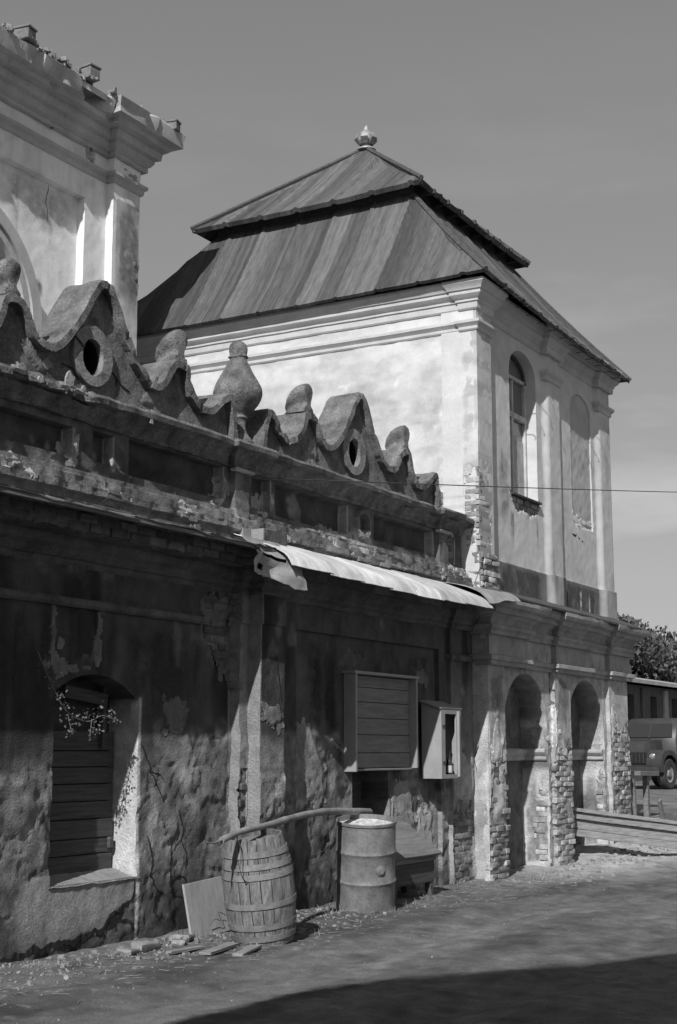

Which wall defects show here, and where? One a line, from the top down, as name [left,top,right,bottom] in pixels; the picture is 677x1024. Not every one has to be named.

spalling [1,450,38,479]
spalling [55,434,80,468]
flaking render [0,476,260,567]
flaking render [439,464,500,589]
flaking render [509,491,540,518]
flaking render [43,604,107,680]
crack [0,744,188,963]
flaking render [453,708,511,884]
flaking render [529,704,576,867]
flaking render [590,704,632,844]